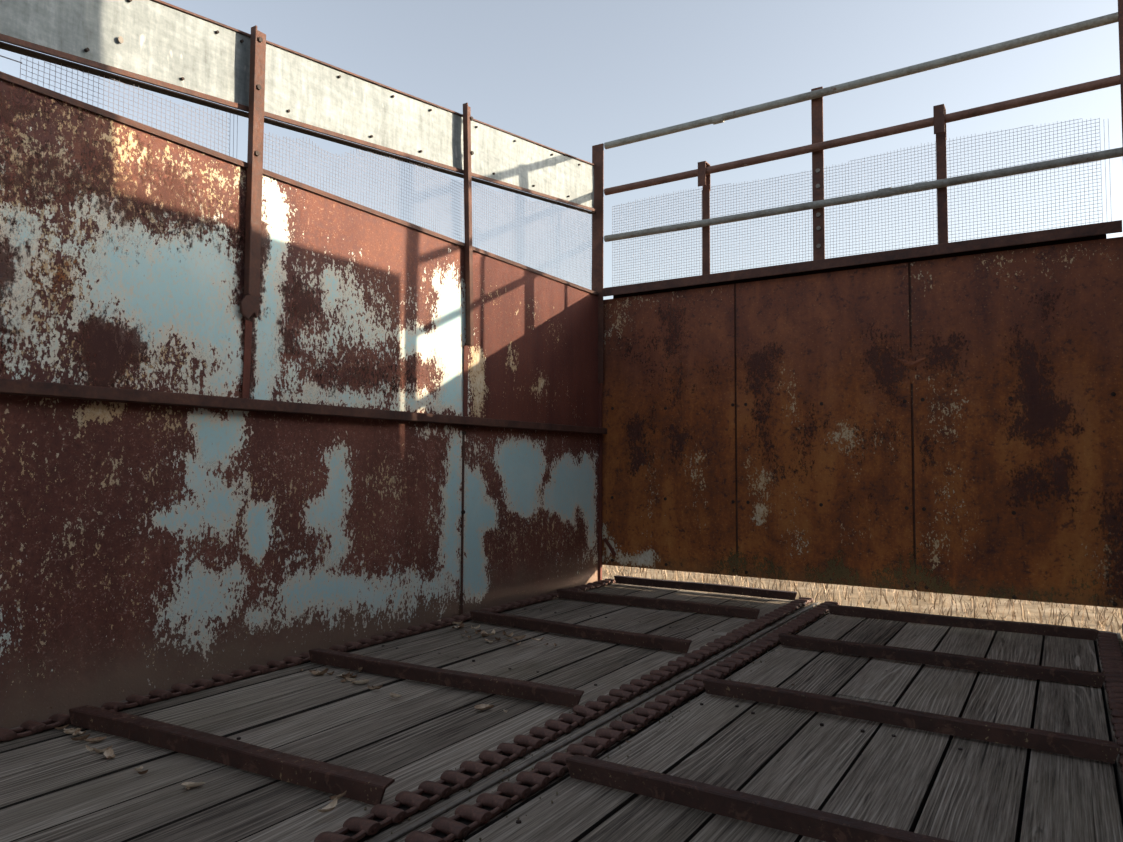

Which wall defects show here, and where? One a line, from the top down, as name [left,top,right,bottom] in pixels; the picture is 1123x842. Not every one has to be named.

rust [0,87,435,406]
peeling [0,82,661,709]
rust [617,367,697,479]
rust [740,342,828,490]
rust [993,325,1085,516]